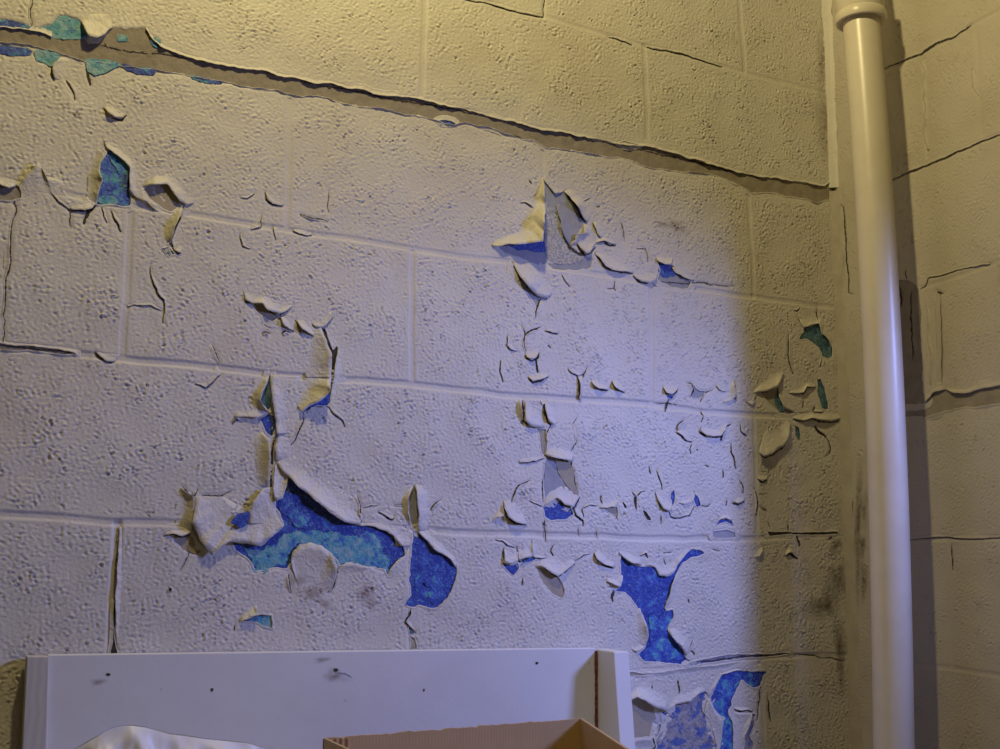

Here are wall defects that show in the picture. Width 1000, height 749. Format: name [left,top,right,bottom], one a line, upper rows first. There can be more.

peeling [0,139,194,259]
crack [301,81,475,115]
peeling [0,14,834,202]
peeling [492,176,733,291]
crack [608,36,722,67]
crack [643,150,759,178]
crack [884,24,971,69]
crack [892,133,1000,180]
crack [899,263,990,358]
peeling [164,290,464,650]
peeling [492,304,840,749]
crack [107,527,128,653]